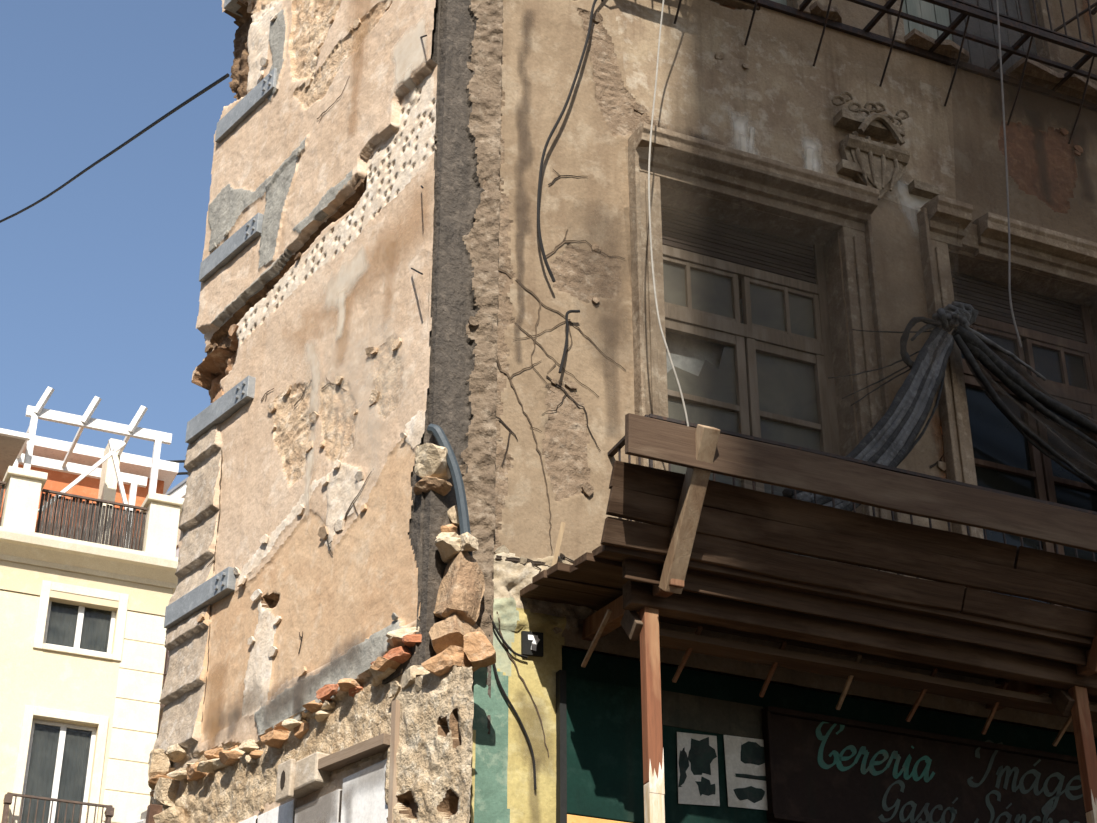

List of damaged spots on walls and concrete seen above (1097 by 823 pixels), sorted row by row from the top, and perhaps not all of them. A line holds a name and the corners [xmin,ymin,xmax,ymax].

spalling [154,0,597,823]
water stain [516,16,531,331]